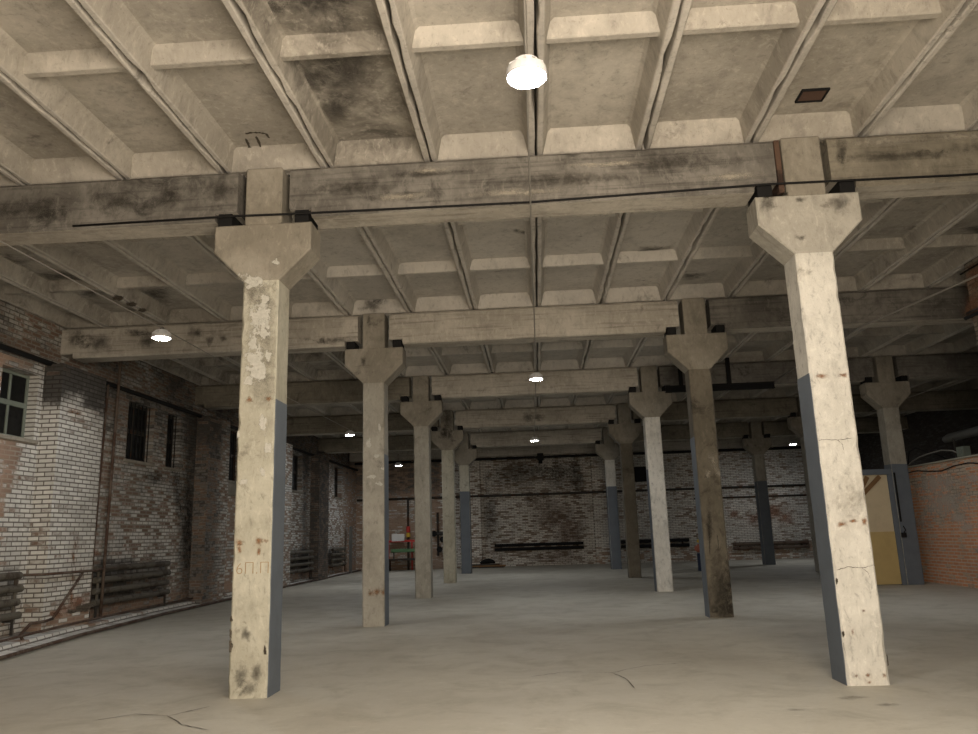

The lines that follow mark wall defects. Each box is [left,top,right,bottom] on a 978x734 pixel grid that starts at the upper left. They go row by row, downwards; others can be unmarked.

water stain [333,56,363,86]
peeling [238,273,273,386]